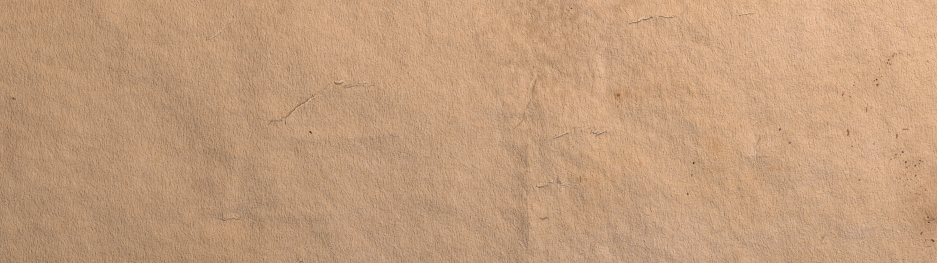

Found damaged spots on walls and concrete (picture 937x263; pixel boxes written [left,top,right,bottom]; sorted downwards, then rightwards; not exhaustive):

crack [269,80,367,128]